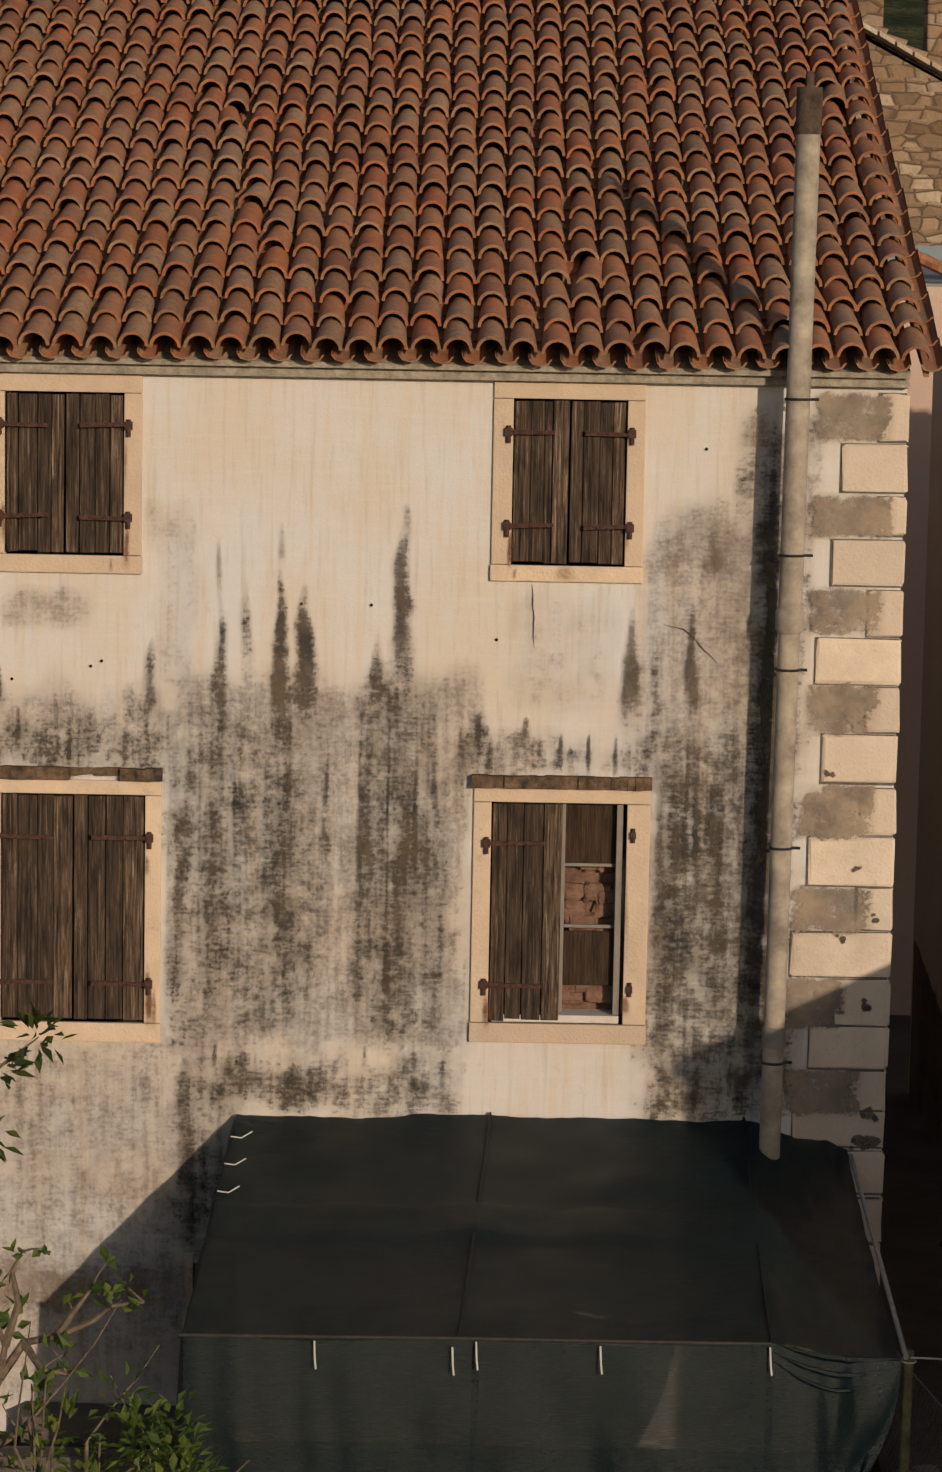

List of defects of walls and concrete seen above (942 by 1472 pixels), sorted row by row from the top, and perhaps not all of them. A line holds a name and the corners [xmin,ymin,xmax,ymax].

leakage [6,712,100,766]
leakage [120,653,159,767]
leakage [613,417,784,1122]
flaking render [796,770,876,841]
leakage [172,540,591,1240]
flaking render [791,866,880,944]
flaking render [785,976,872,1030]
flaking render [909,939,942,1153]
flaking render [781,1068,881,1151]